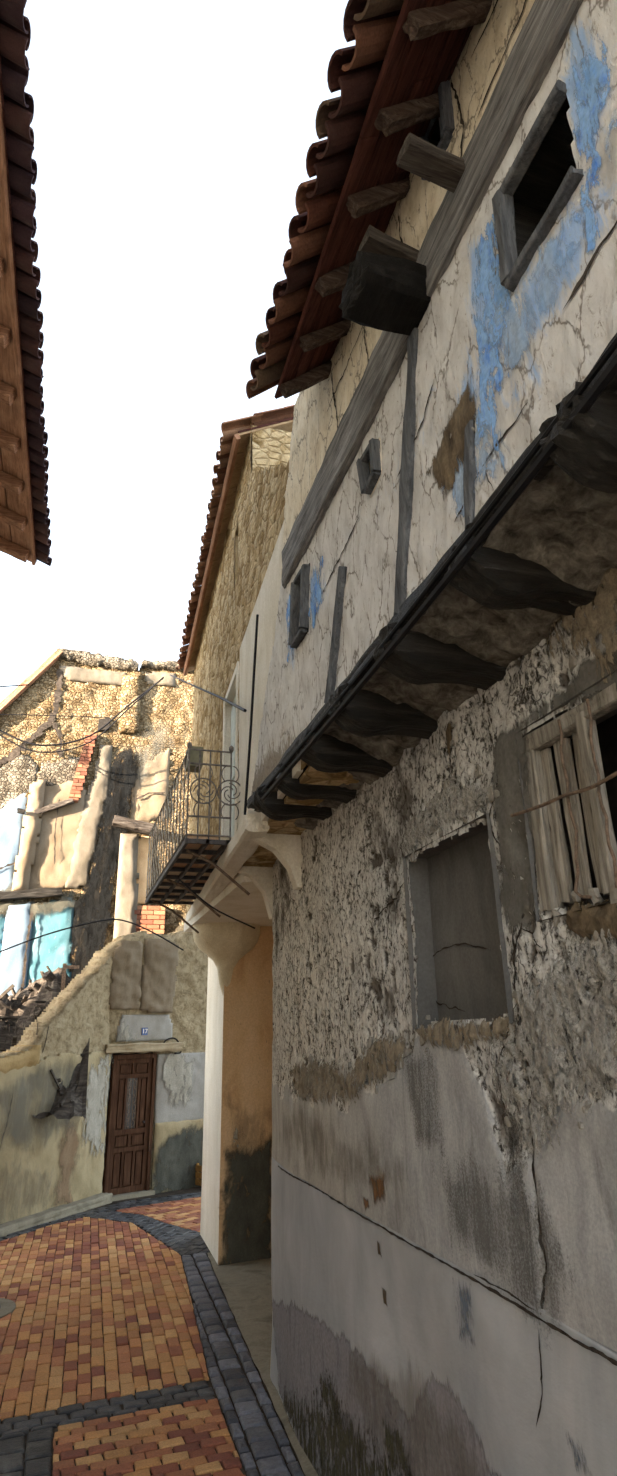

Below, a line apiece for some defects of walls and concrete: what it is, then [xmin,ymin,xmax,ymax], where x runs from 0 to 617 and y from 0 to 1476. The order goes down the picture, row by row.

peeling [572,34,617,252]
crack [562,221,617,311]
peeling [426,215,511,517]
crack [374,883,404,977]
flaking render [288,885,617,1174]
peeling [55,1054,113,1205]
leakage [153,1125,203,1194]
leakage [219,1137,272,1265]
crack [278,914,617,1426]
leakage [383,1413,412,1476]